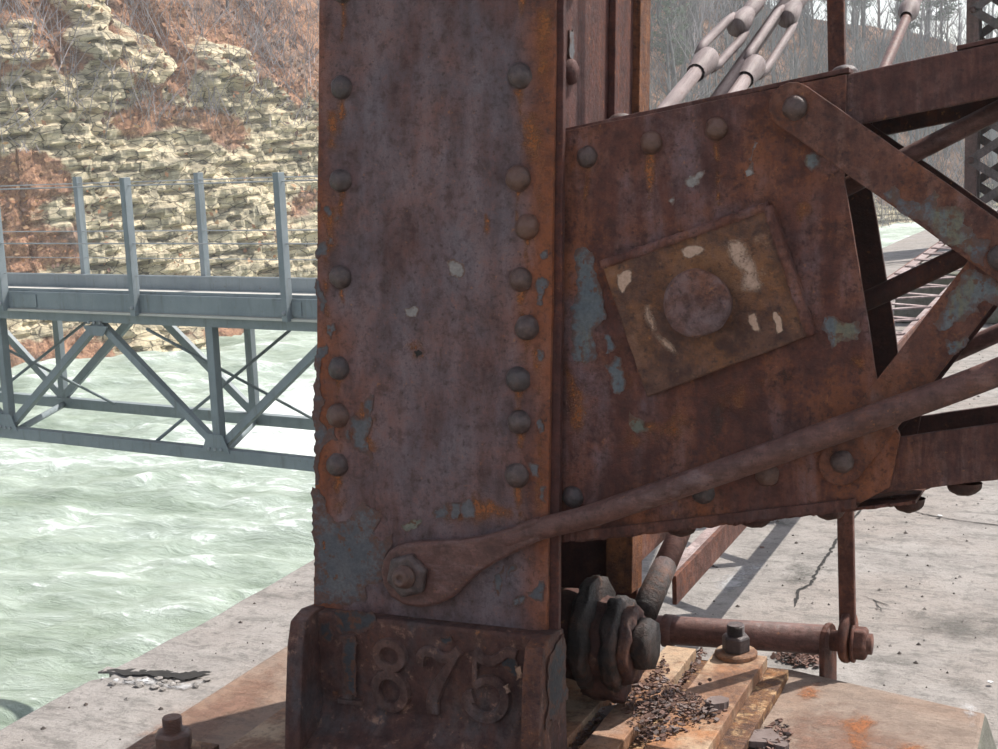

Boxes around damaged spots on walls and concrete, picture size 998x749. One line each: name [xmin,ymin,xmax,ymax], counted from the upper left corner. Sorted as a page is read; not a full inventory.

peeling [618,270,631,293]
peeling [682,246,704,258]
peeling [728,242,760,290]
peeling [883,185,998,355]
peeling [570,247,626,395]
peeling [748,313,759,331]
peeling [773,312,783,333]
peeling [821,316,861,348]
peeling [310,279,422,606]
crack [794,538,837,607]
corrosion [187,680,273,736]
corrosion [127,733,156,749]